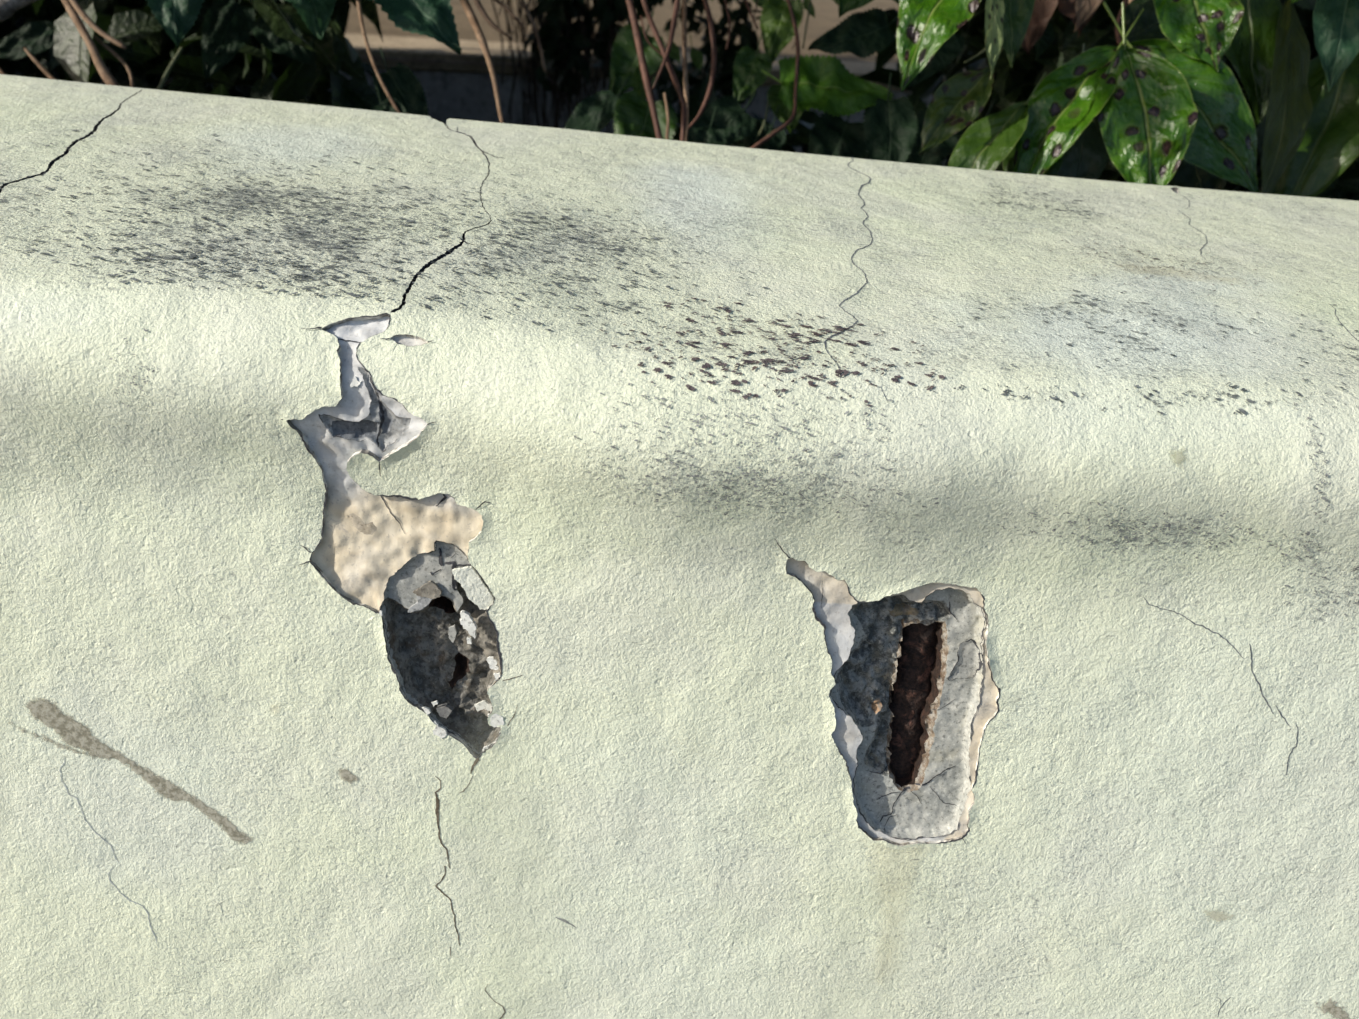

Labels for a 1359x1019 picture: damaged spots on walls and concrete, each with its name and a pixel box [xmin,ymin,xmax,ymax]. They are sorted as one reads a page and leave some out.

crack [0,90,142,193]
crack [391,124,501,312]
leakage [0,127,966,523]
crack [824,157,873,375]
leakage [918,175,1359,629]
peeling [276,313,511,759]
leakage [9,723,95,757]
spalling [775,539,1009,854]
crack [1144,598,1298,775]
crack [435,758,479,956]